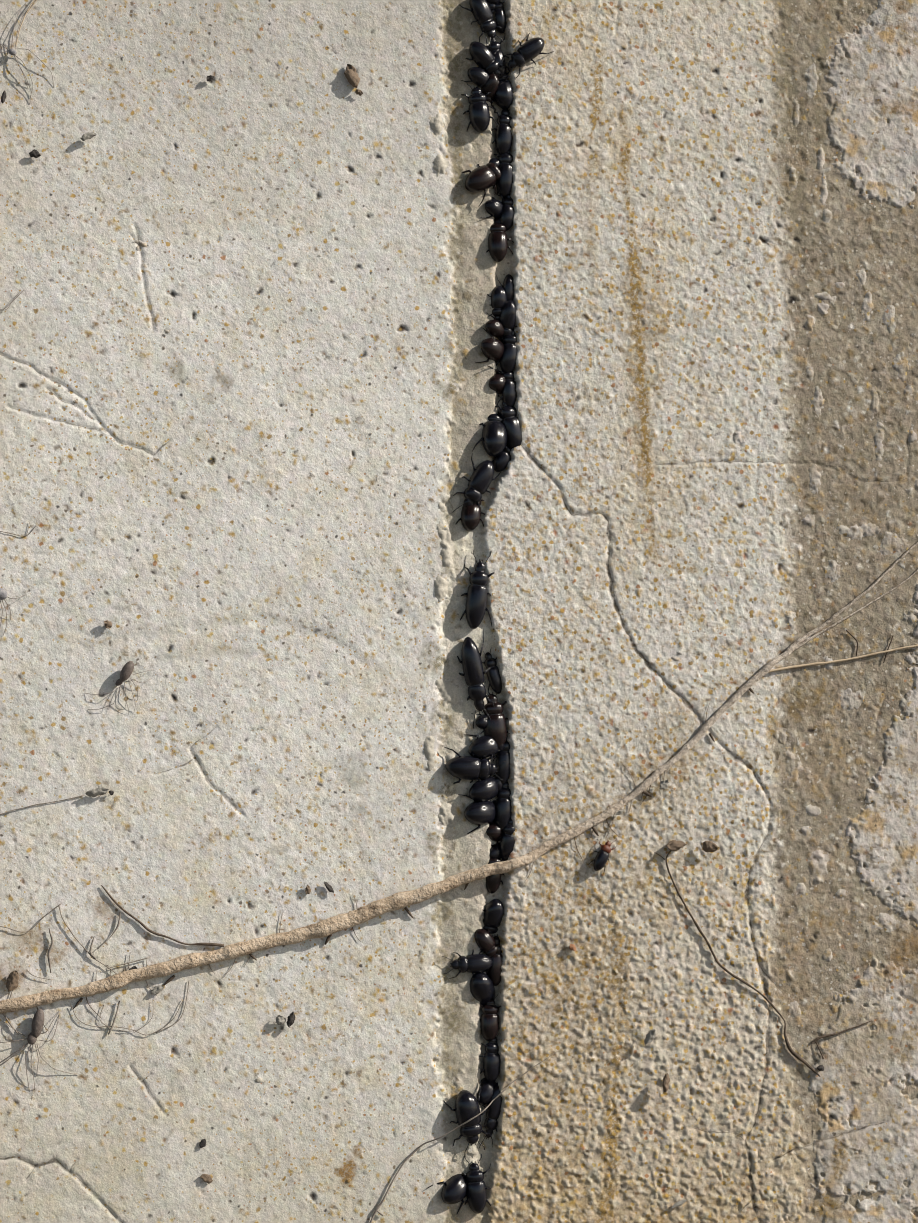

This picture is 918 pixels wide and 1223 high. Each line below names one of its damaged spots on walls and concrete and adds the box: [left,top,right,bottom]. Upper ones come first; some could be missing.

crack [521,445,690,708]
crack [745,849,775,1068]
crack [0,1156,88,1188]
crack [702,1096,799,1223]